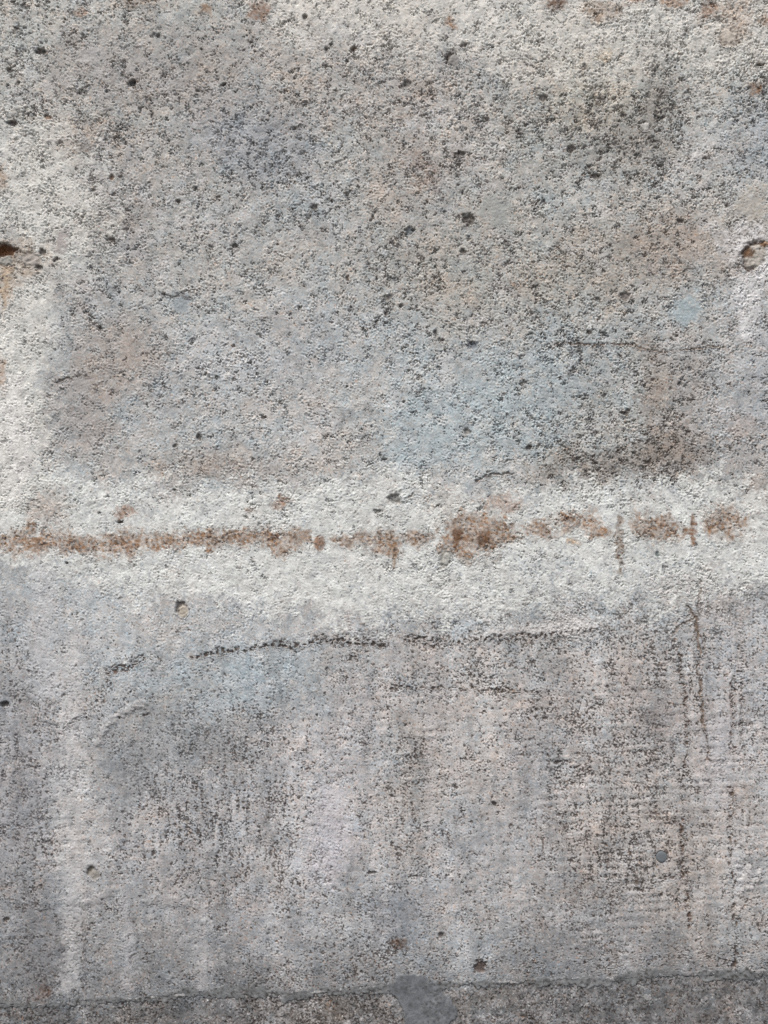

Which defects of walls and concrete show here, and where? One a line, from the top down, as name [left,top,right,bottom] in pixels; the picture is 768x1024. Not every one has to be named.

corrosion [0,482,752,576]
crack [189,627,599,660]
crack [103,654,145,677]